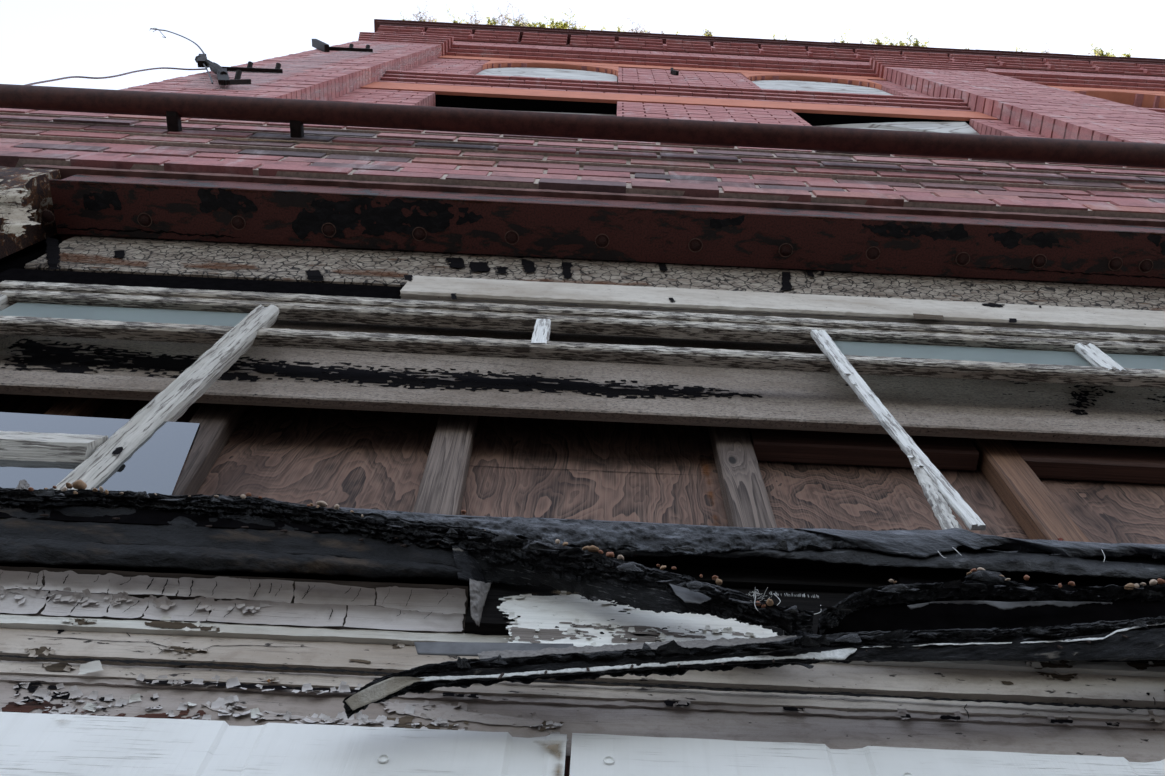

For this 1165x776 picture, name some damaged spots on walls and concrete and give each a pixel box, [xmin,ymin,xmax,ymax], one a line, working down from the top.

peeling [0,179,40,237]
peeling [1,338,199,378]
peeling [218,357,763,401]
peeling [0,570,467,648]
peeling [497,591,778,647]
peeling [0,645,362,720]
peeling [1025,660,1078,681]
peeling [380,705,469,730]